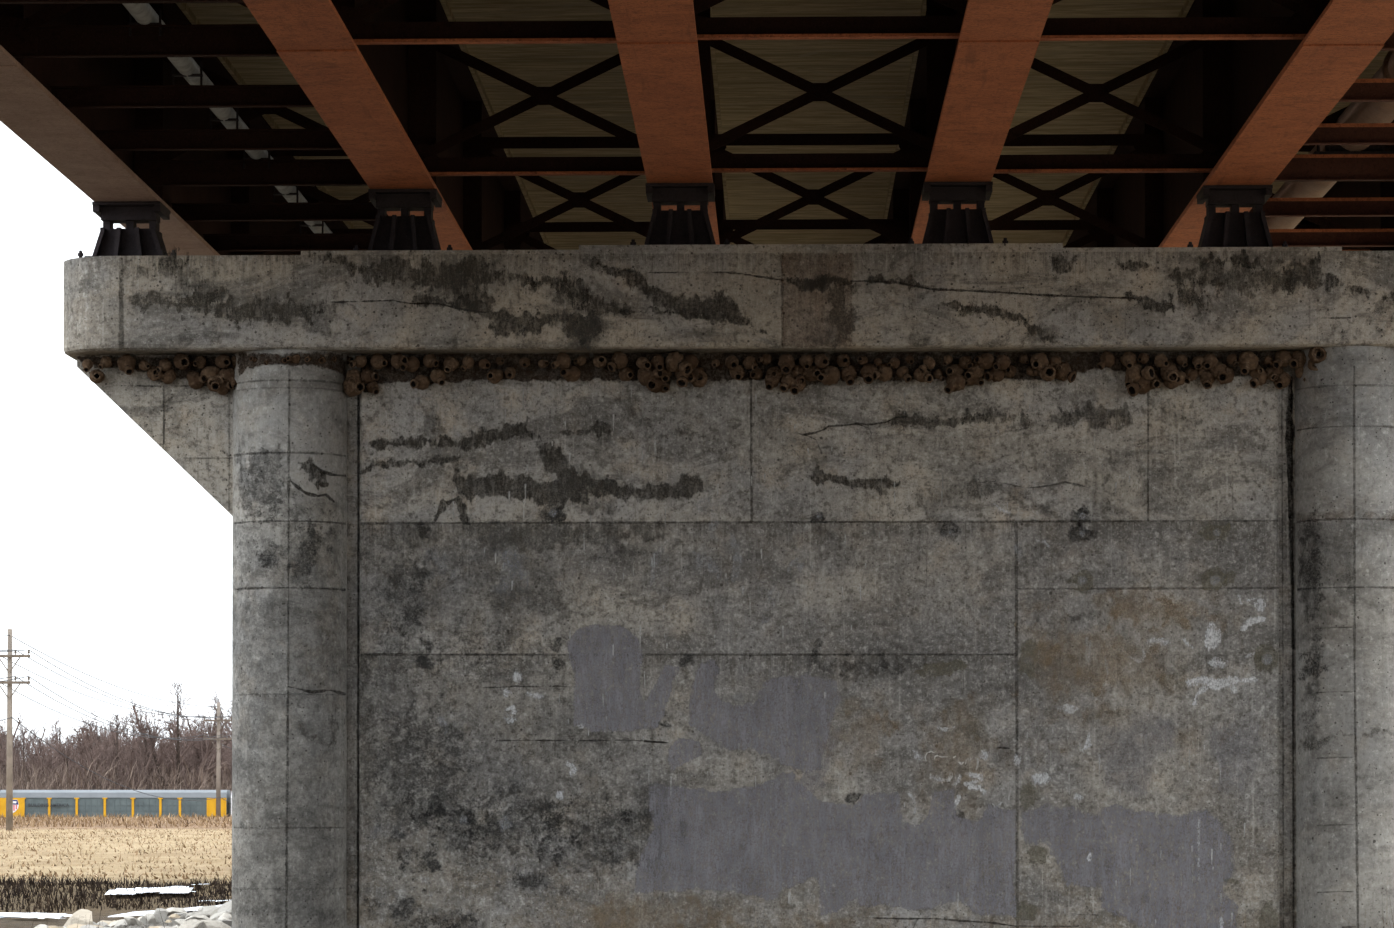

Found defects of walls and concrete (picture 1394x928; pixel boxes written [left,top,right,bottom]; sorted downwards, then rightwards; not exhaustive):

damp [121,248,344,335]
damp [304,248,766,348]
damp [938,300,1058,344]
crack [850,273,1175,313]
damp [1168,249,1394,320]
crack [290,458,346,502]
damp [360,386,719,566]
damp [807,448,900,495]
peeling [1238,595,1266,631]
peeling [1129,623,1257,705]
peeling [930,751,1003,809]
peeling [1014,754,1051,785]